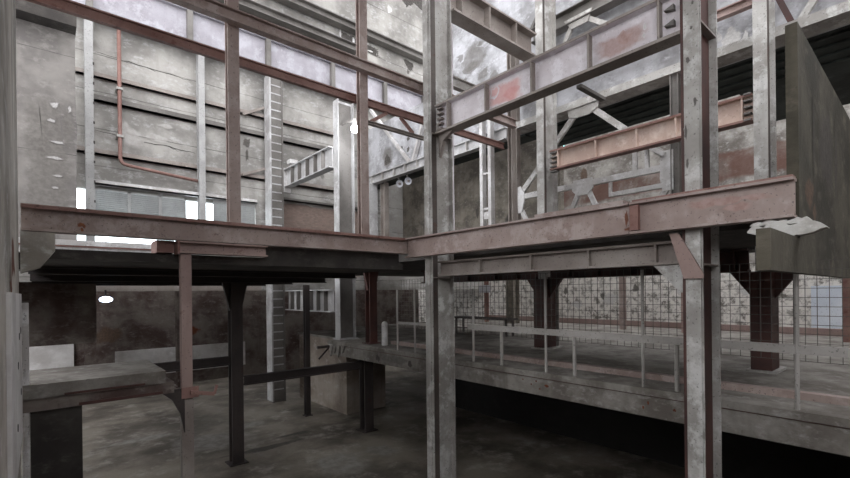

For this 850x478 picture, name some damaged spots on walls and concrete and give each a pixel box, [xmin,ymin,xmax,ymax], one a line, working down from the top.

corrosion [592,12,654,65]